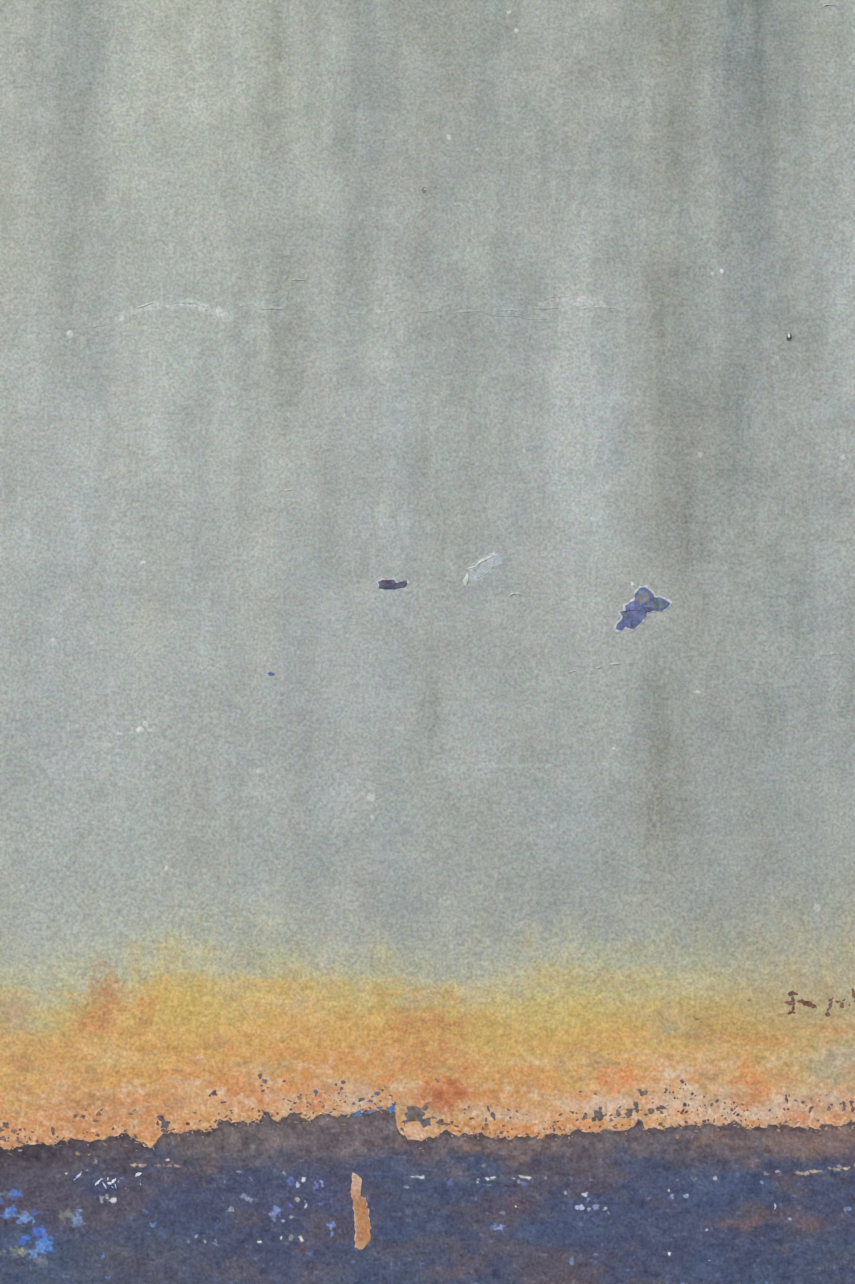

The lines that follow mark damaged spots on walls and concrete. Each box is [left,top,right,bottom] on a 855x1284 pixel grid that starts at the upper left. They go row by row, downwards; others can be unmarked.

peeling [614,582,672,633]
corrosion [0,949,855,1149]